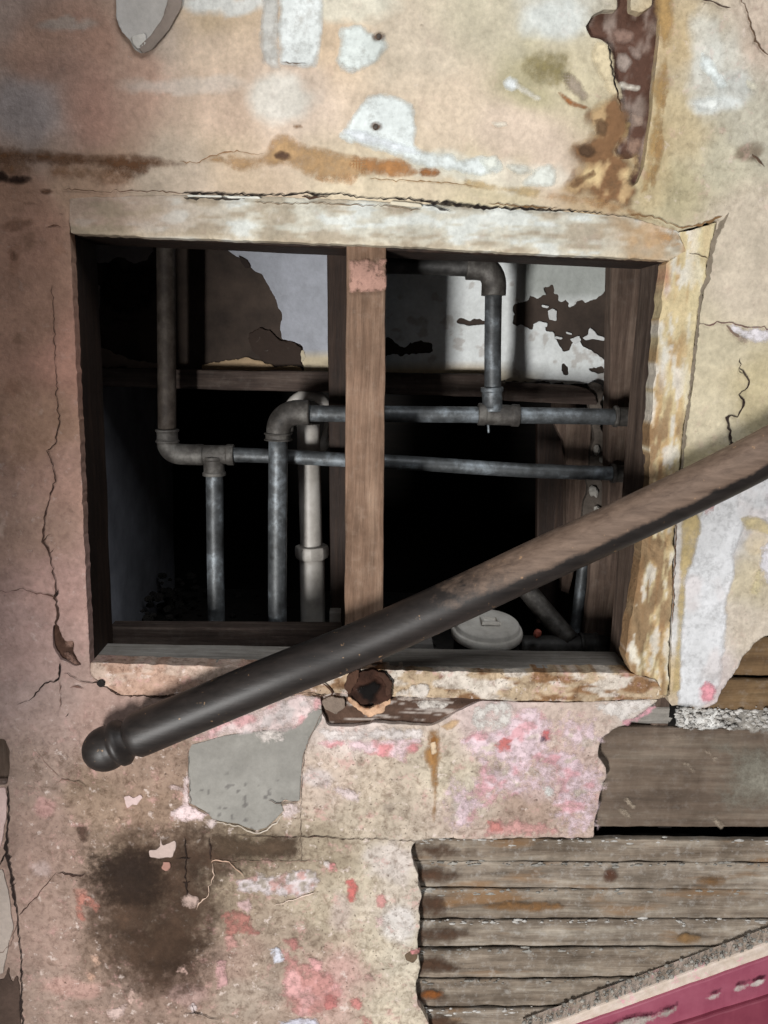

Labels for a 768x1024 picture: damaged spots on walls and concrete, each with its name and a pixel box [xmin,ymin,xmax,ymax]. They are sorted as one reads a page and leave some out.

peeling [116,0,182,54]
peeling [260,0,323,67]
corrosion [353,158,488,188]
flaking render [338,0,658,206]
crack [703,0,768,55]
crack [64,188,768,469]
crack [3,288,60,626]
peeling [668,479,768,726]
flaking render [171,684,655,837]
corrosion [425,721,458,786]
damp [84,827,297,993]
crack [176,812,416,894]